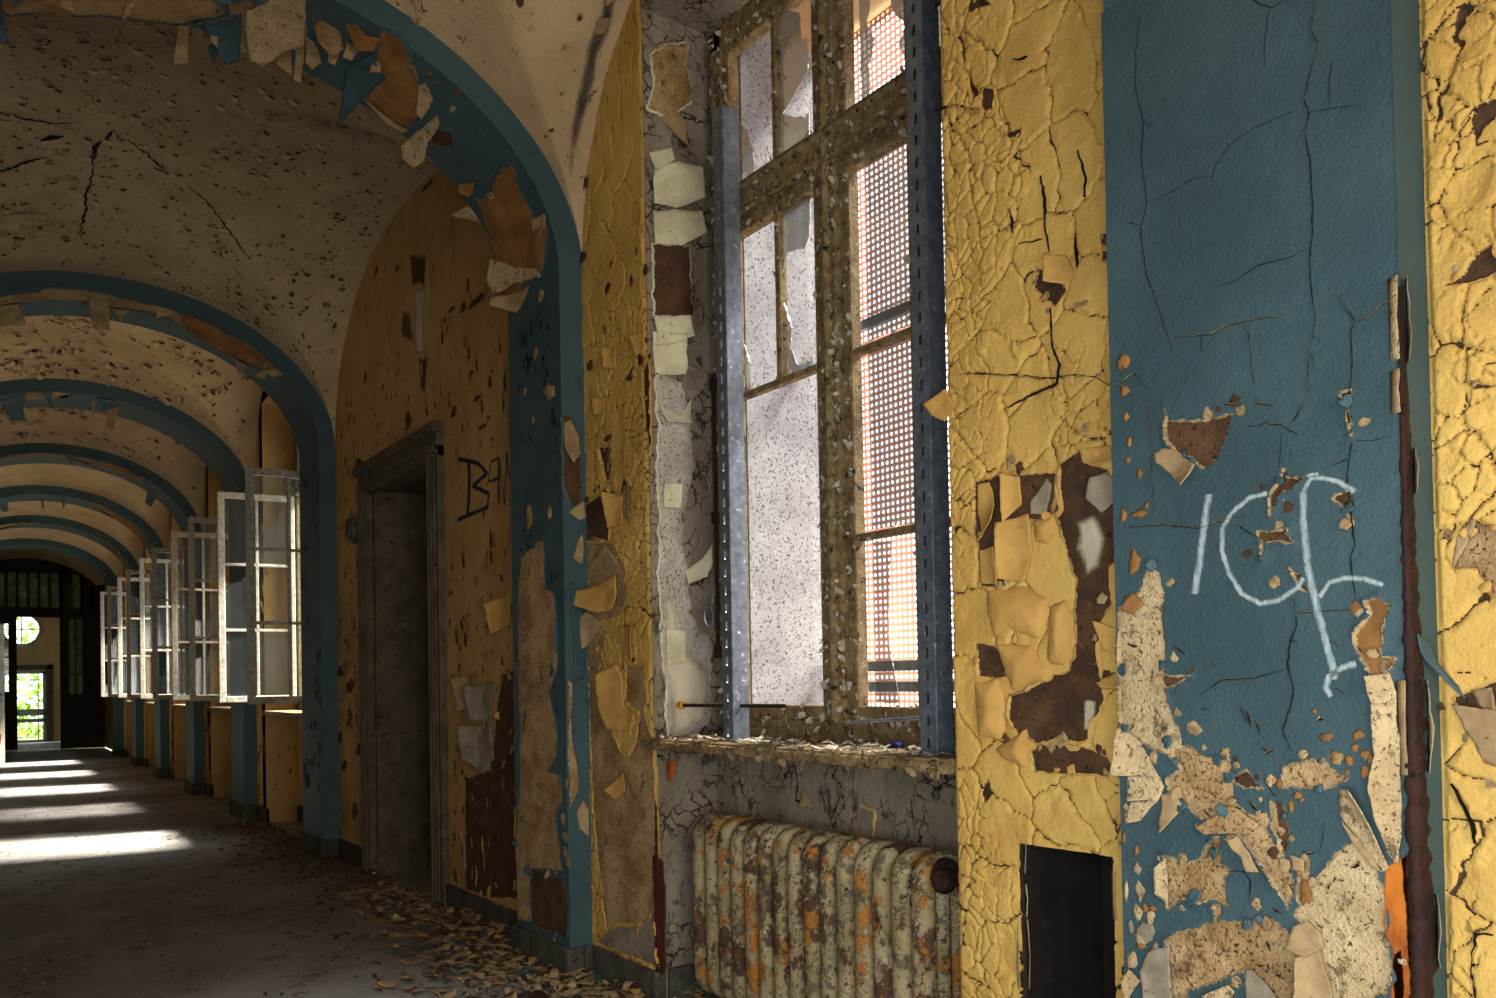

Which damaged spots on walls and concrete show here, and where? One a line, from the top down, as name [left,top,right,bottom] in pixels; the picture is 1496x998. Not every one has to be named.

crack [935,103,976,111]
crack [0,112,248,257]
crack [1008,175,1079,268]
crack [1077,150,1087,197]
peeling [1445,243,1496,287]
crack [947,308,1259,538]
crack [1125,0,1391,811]
peeling [0,494,68,529]
peeling [90,501,150,550]
peeling [973,354,1407,998]
crack [1303,821,1391,889]
crack [1227,870,1282,977]